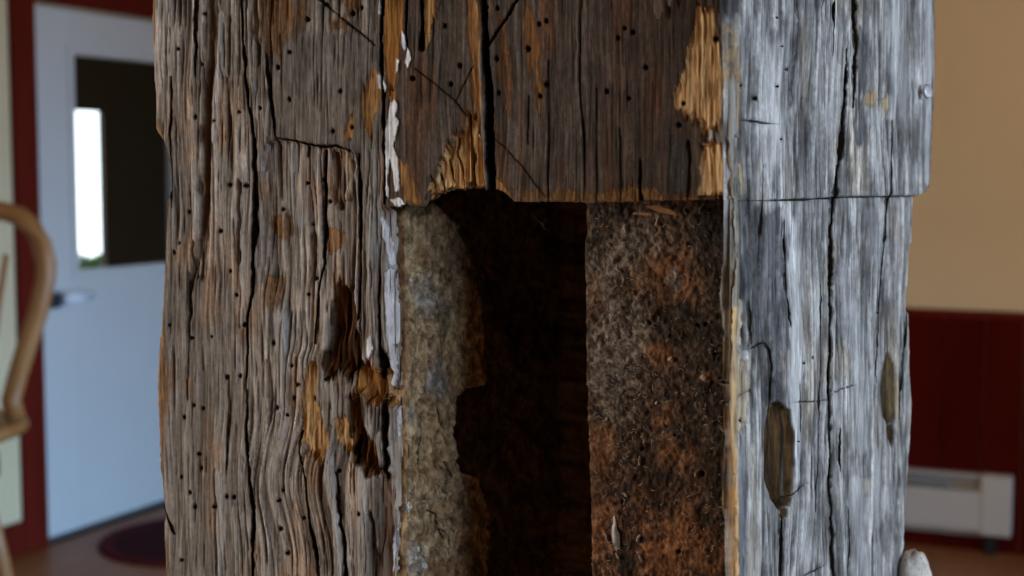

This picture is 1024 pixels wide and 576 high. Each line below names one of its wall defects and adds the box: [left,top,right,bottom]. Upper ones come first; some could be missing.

peeling [377,32,411,206]
crack [441,0,549,197]
peeling [698,139,731,214]
crack [185,277,193,400]
crack [225,0,442,576]
peeling [380,216,403,437]
crack [744,0,858,576]
crack [875,120,908,420]
peeling [334,393,384,478]
peeling [393,527,428,572]
peeling [604,516,620,560]